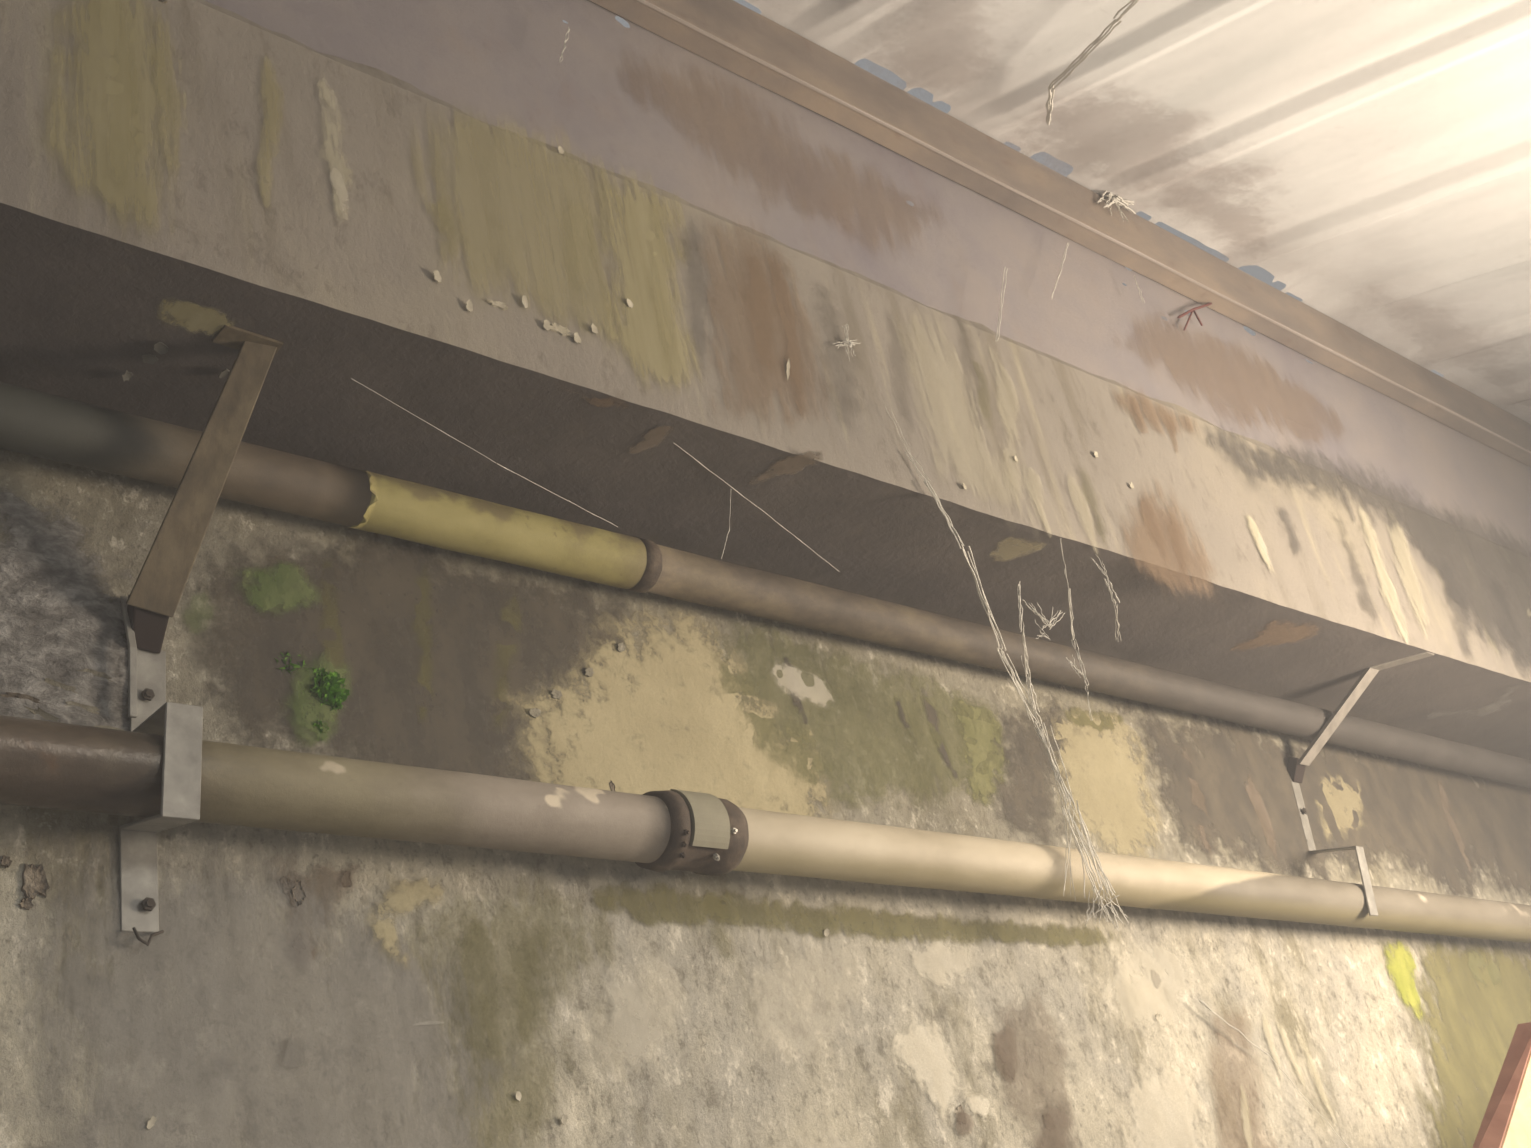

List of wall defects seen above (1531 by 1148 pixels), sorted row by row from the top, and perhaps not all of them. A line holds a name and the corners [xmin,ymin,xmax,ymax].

damp [1247,516,1271,569]
damp [1361,511,1407,642]
damp [203,534,626,780]
damp [998,697,1064,842]